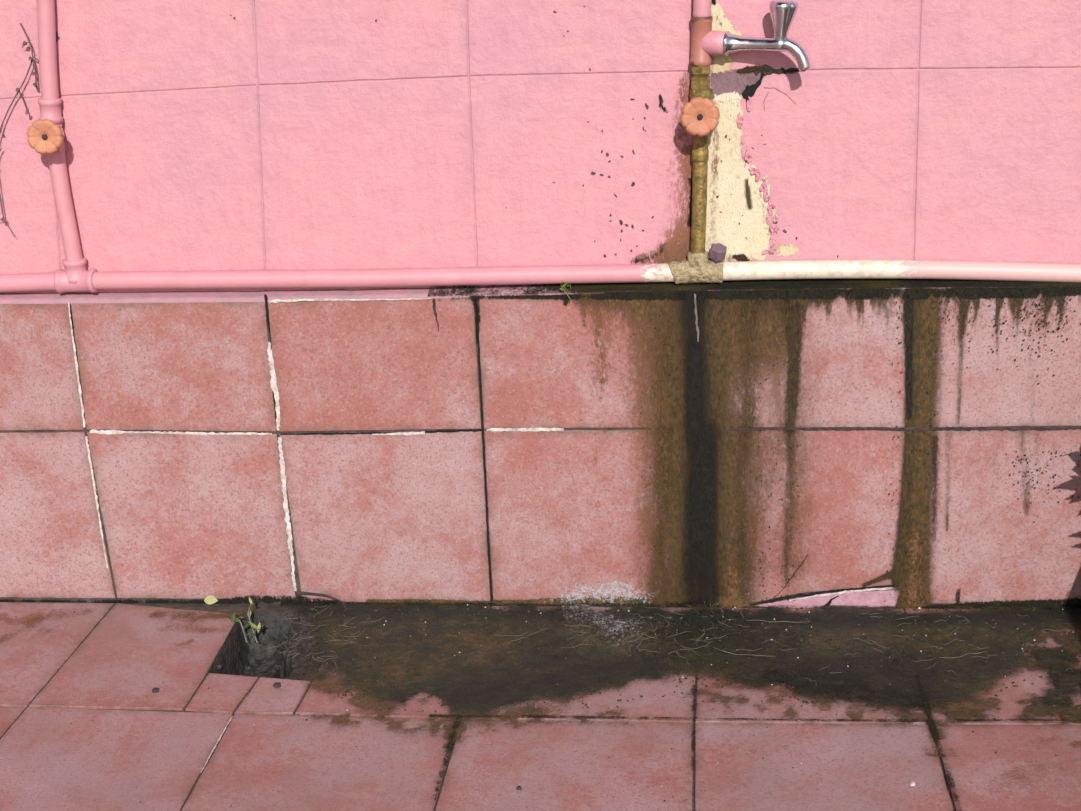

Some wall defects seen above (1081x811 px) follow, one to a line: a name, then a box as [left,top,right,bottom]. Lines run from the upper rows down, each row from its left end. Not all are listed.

peeling [711,0,742,36]
corrosion [635,81,693,264]
peeling [705,55,806,262]
damp [366,285,1081,644]
spalling [208,611,321,681]
crack [750,555,892,606]